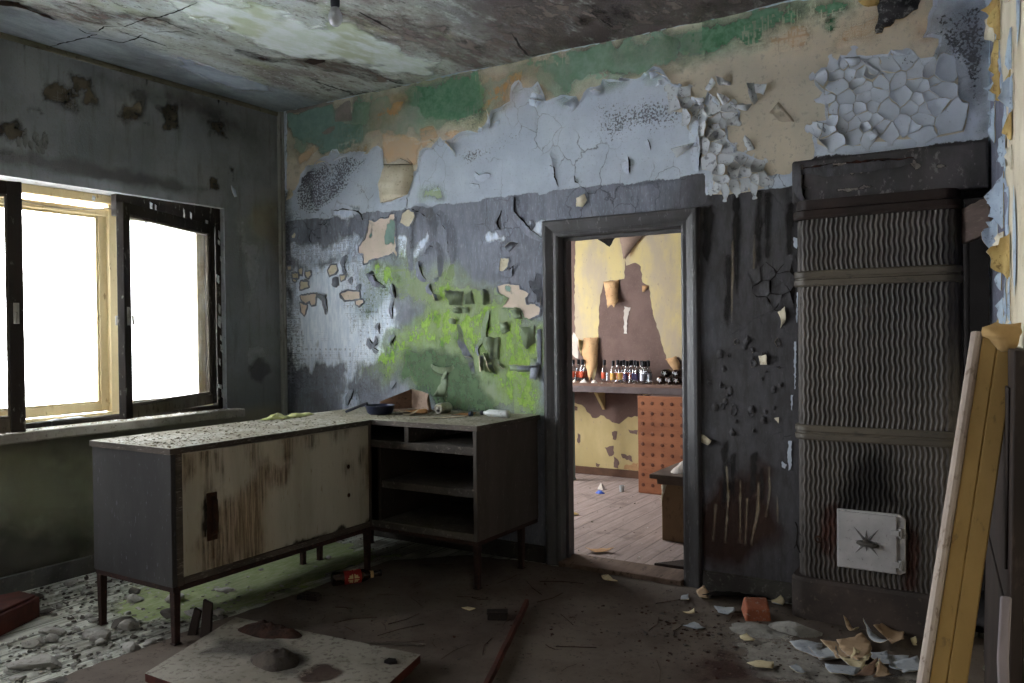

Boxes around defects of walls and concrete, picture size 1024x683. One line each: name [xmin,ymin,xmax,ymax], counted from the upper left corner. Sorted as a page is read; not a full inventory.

crack [50,3,201,47]
spalling [0,120,23,140]
spalling [38,73,98,114]
spalling [159,104,179,130]
peeling [284,0,969,265]
peeling [981,0,1020,325]
water stain [170,0,849,415]
peeling [287,263,365,317]
peeling [432,242,542,380]
spalling [781,441,792,471]
rust [702,441,779,564]